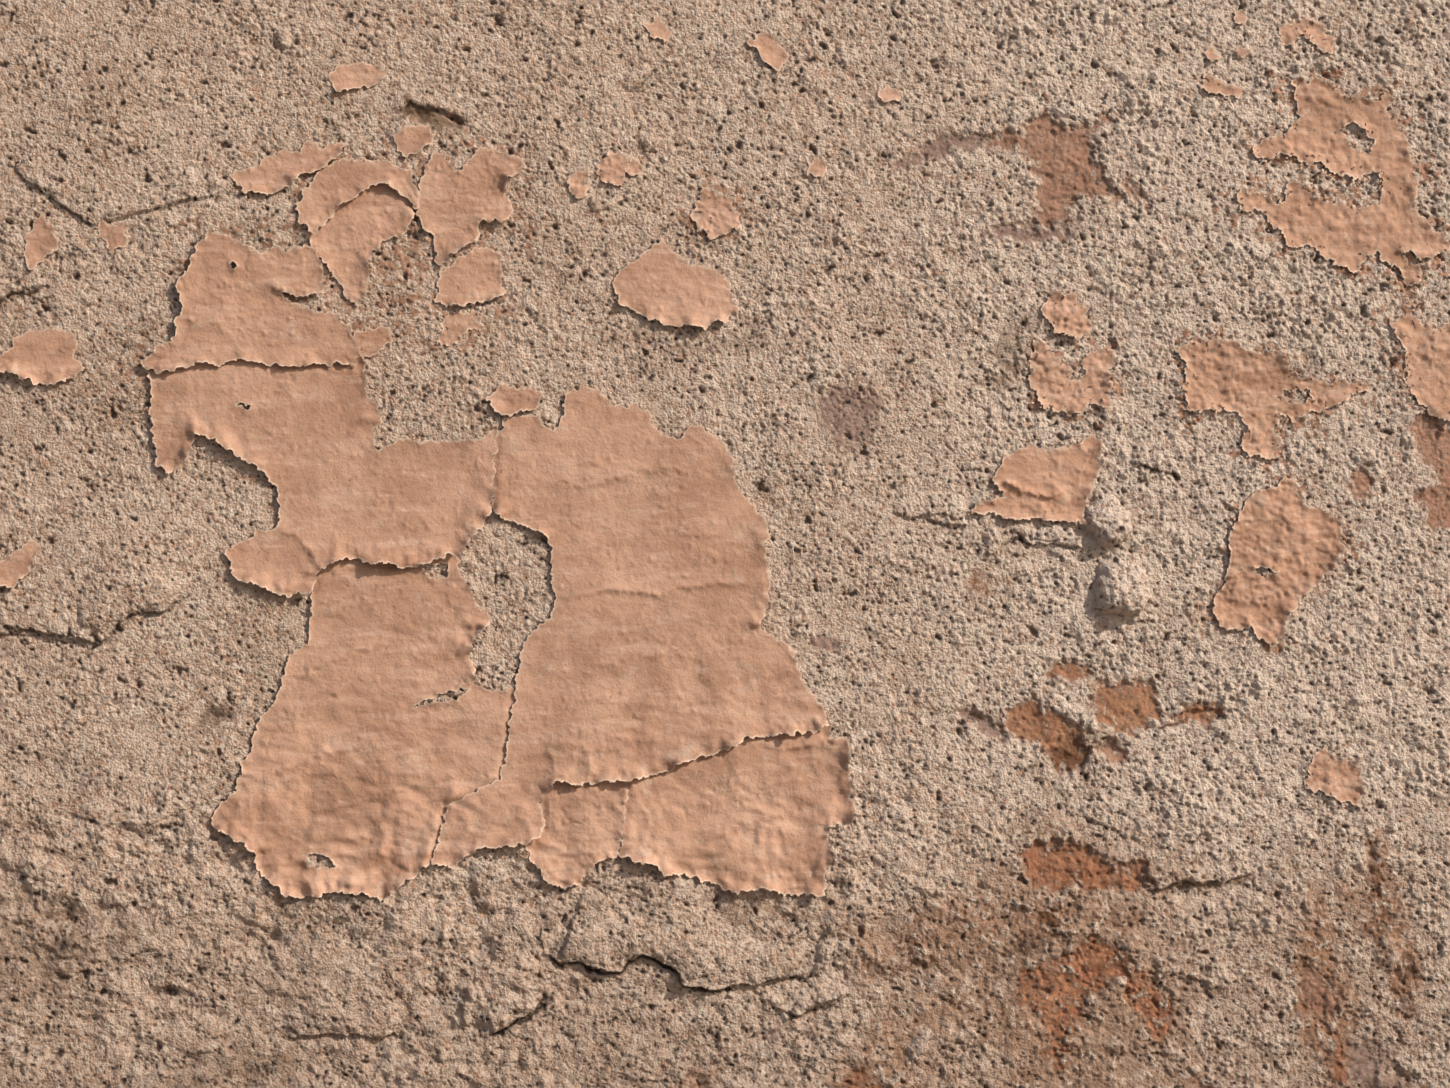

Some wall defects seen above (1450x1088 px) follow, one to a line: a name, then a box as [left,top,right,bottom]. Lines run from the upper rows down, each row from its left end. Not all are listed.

spalling [896,115,1152,242]
peeling [0,326,85,386]
peeling [968,288,1129,525]
peeling [1152,9,1450,654]
peeling [126,94,857,902]
spalling [954,663,1223,773]
crack [489,927,845,1040]